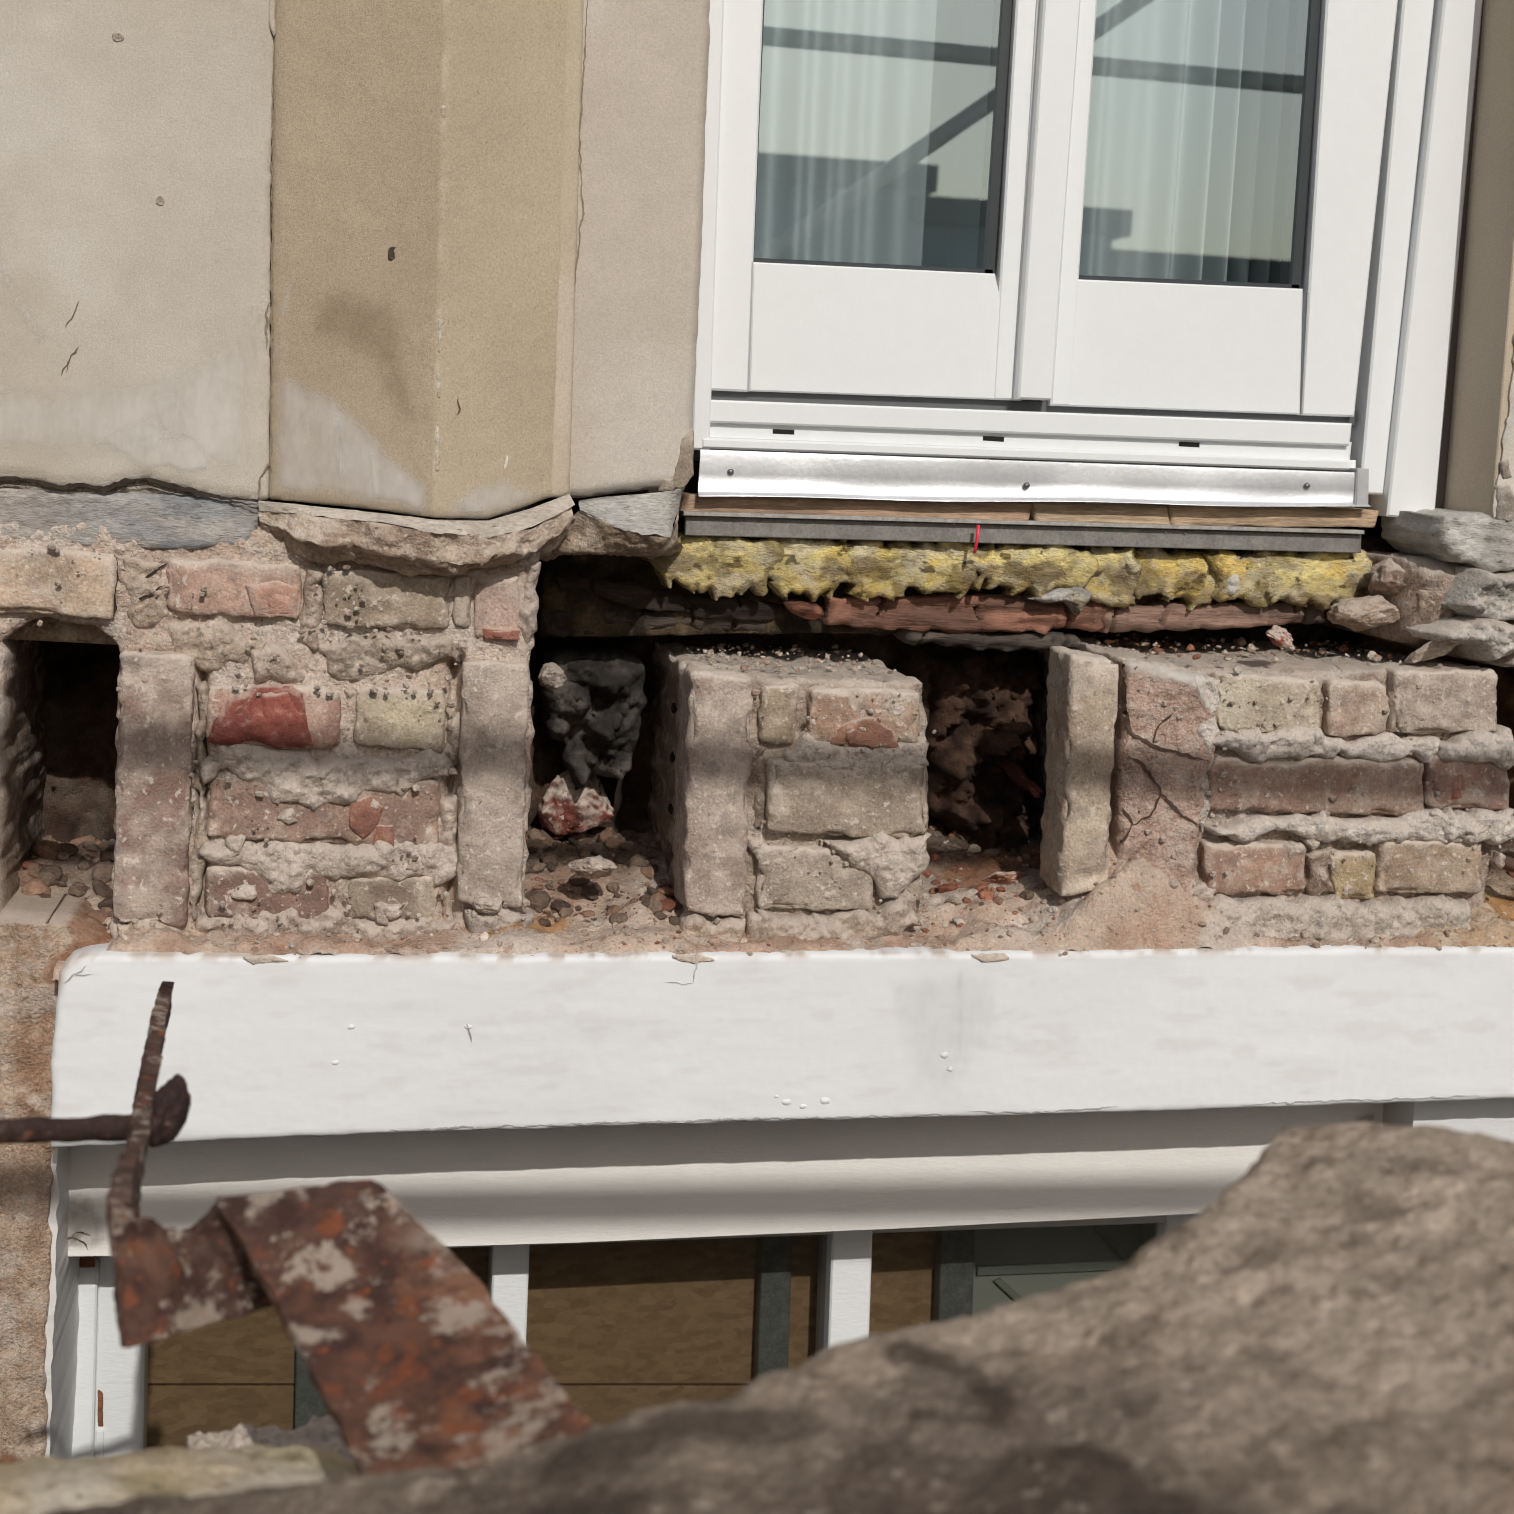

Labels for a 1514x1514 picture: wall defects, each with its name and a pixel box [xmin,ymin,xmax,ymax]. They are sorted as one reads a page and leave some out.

crack [574,0,588,290]
spalling [246,580,299,619]
spalling [483,628,520,641]
spalling [207,683,312,749]
crack [1120,663,1207,843]
spalling [349,795,394,847]